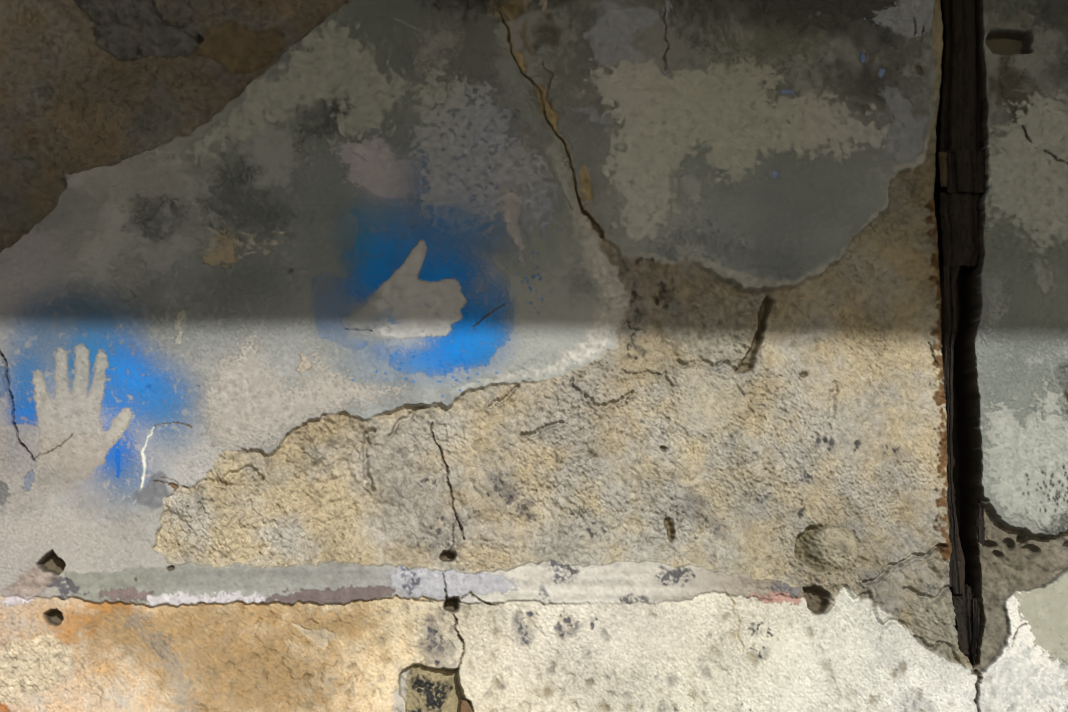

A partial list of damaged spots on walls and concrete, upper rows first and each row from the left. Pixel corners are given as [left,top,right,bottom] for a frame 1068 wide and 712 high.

flaking render [0,0,593,267]
crack [474,0,605,239]
peeling [981,82,1068,301]
peeling [0,481,10,505]
peeling [2,567,56,606]
crack [0,351,73,461]
flaking render [399,664,473,712]
crack [414,423,499,671]
flaking render [99,0,972,668]
crack [973,670,984,712]
peeling [975,267,1015,346]
peeling [971,377,1068,675]